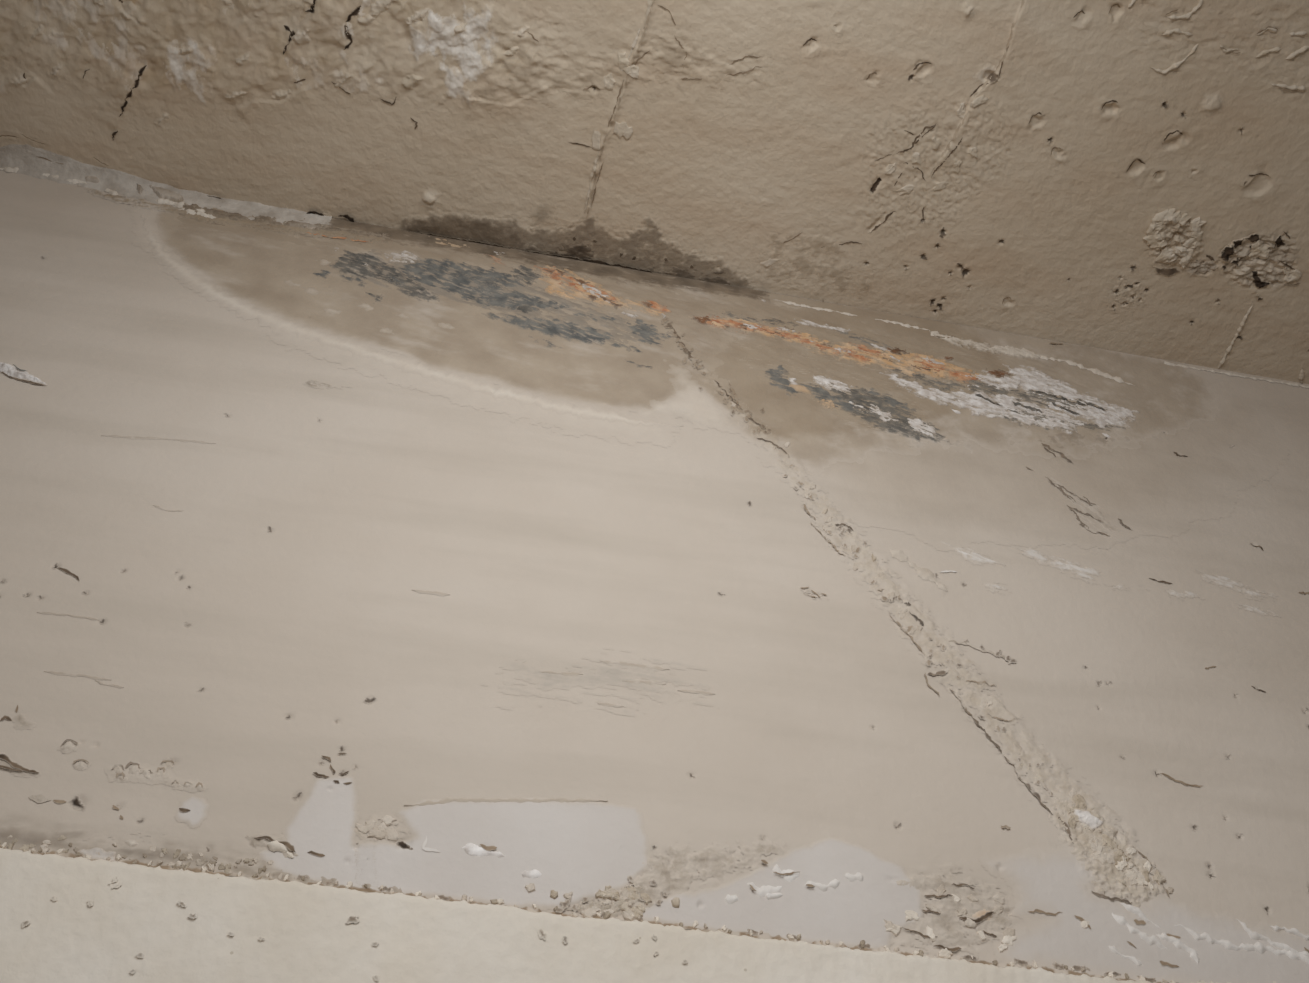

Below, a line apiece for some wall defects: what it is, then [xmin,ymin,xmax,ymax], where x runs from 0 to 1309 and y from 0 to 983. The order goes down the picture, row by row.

crack [569,0,676,218]
corrosion [523,265,672,319]
leakage [125,198,1290,601]
crack [672,327,789,455]
corrosion [688,314,983,384]
spalling [1111,128,1305,311]
crack [804,504,853,556]
crack [889,602,1170,897]
peeling [245,745,924,949]